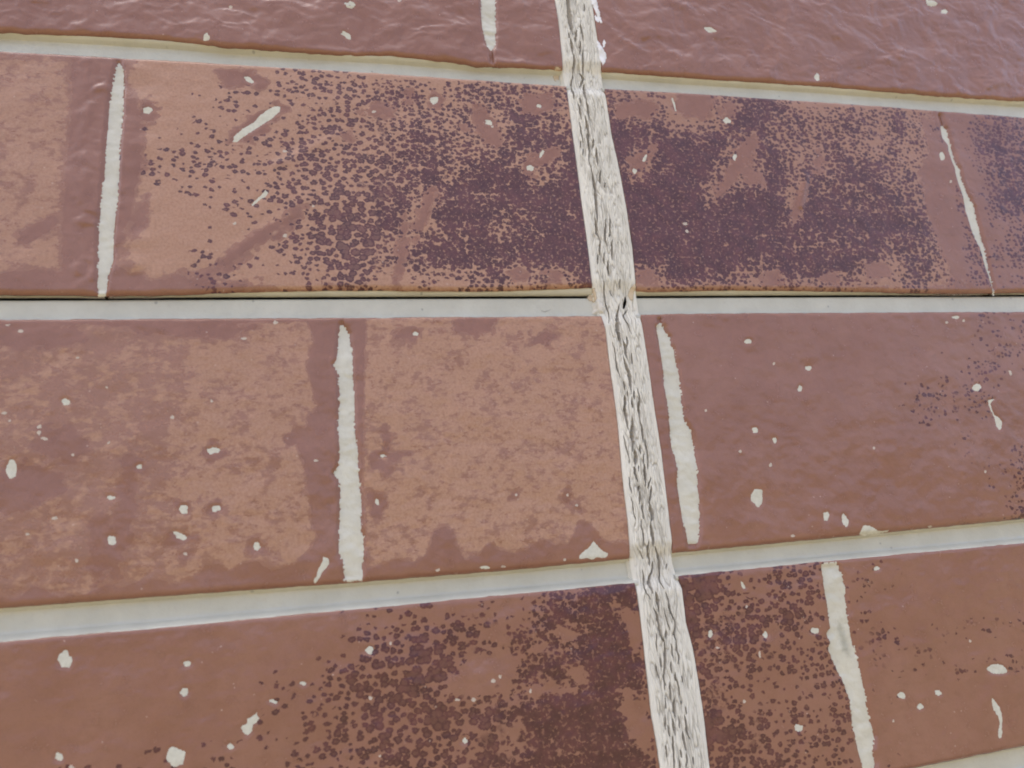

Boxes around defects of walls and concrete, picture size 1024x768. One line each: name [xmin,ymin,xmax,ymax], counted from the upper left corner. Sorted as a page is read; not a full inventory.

peeling [233,106,280,142]
crack [566,0,694,768]